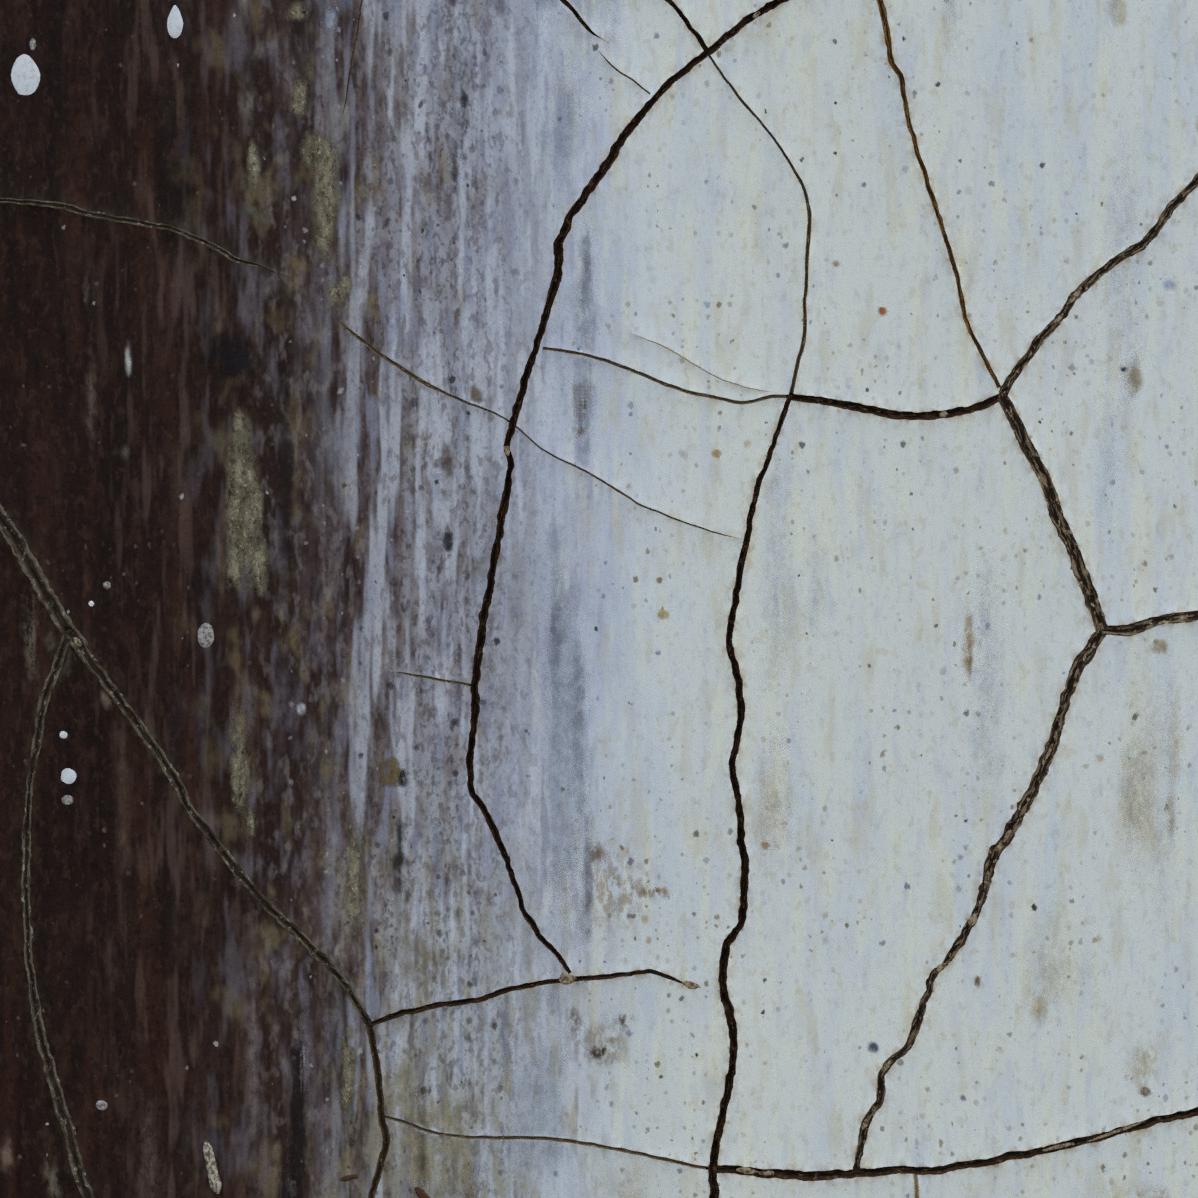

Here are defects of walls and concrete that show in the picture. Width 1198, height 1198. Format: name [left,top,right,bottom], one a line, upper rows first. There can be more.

crack [0,198,289,277]
leakage [576,249,594,462]
leakage [443,526,453,551]
crack [338,0,1198,1168]
leakage [246,977,259,1138]